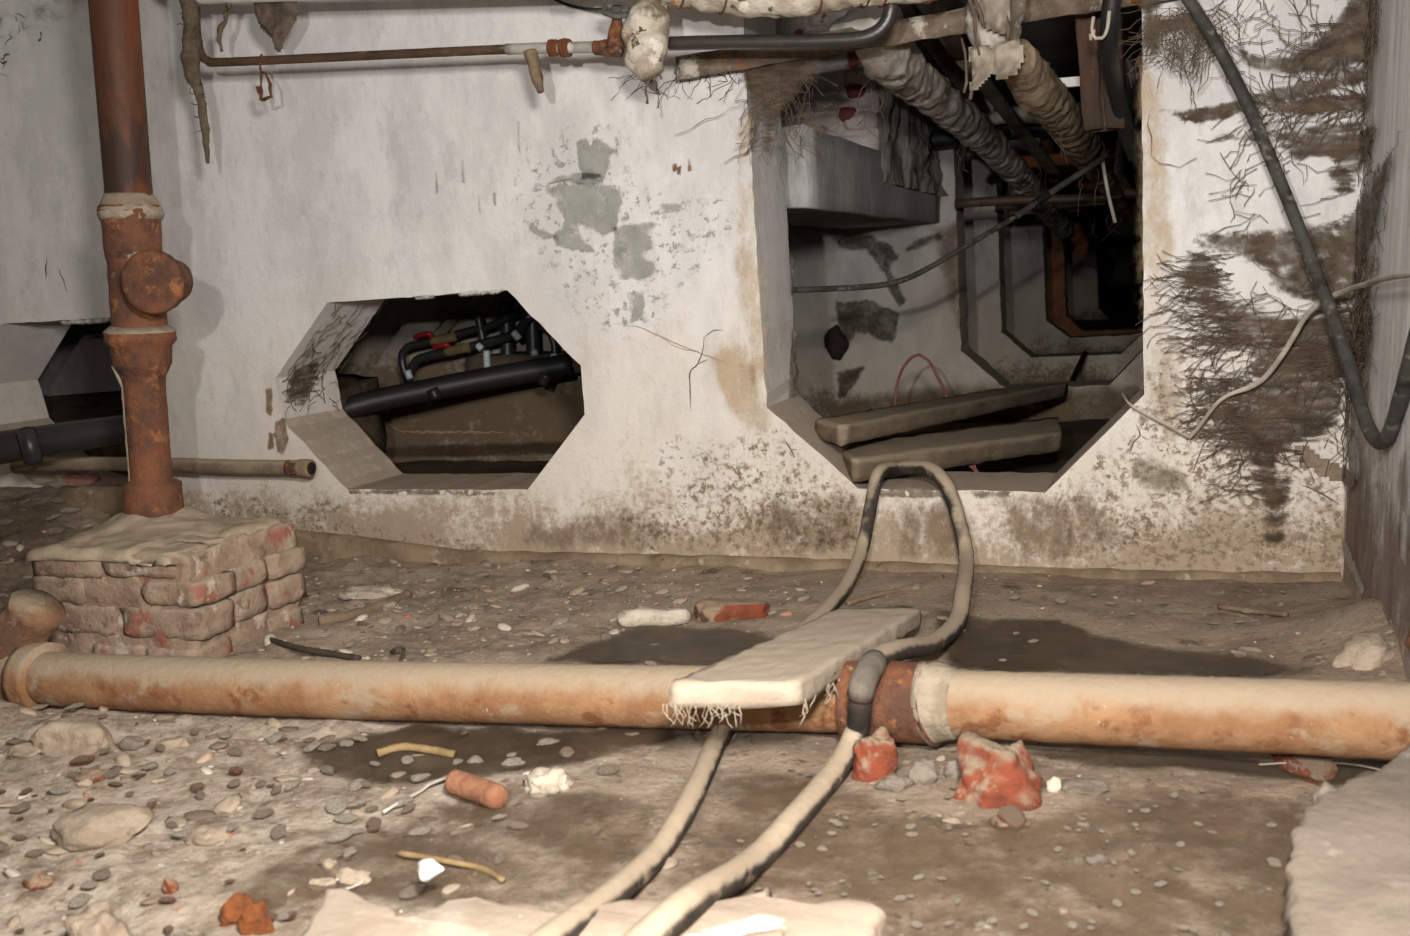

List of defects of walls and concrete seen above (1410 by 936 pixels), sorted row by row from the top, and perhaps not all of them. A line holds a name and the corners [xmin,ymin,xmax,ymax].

peeling [530,127,726,325]
water stain [1135,461,1186,491]
water stain [769,498,855,549]
water stain [904,503,955,555]
water stain [1004,498,1106,559]
water stain [1343,454,1410,633]